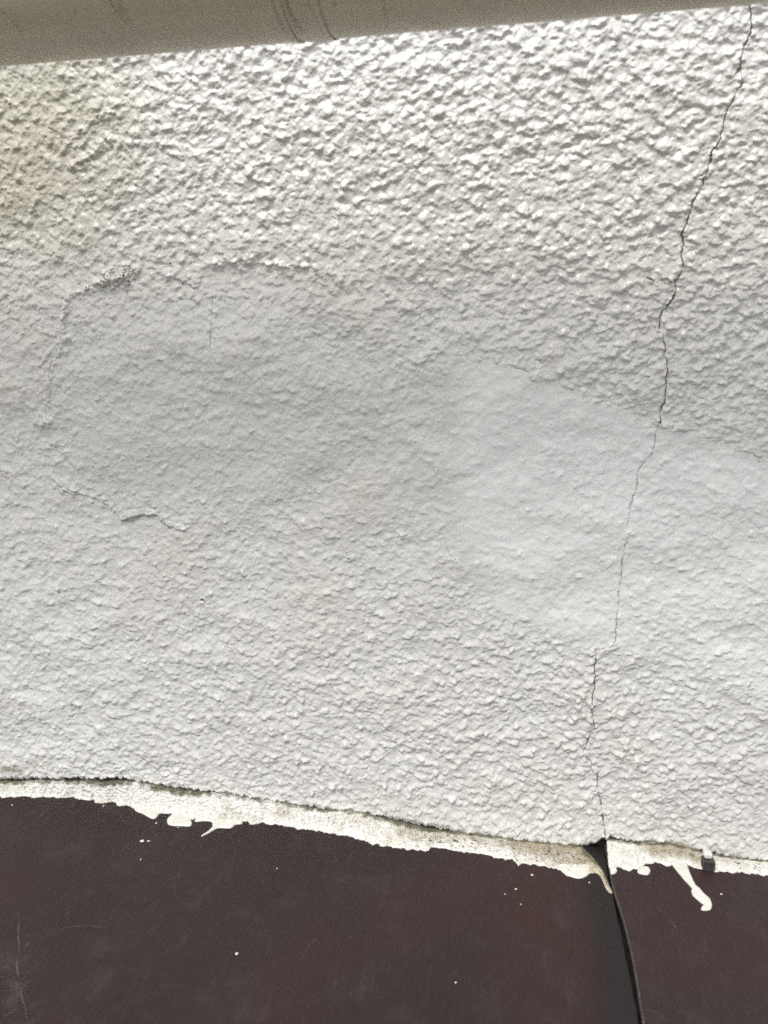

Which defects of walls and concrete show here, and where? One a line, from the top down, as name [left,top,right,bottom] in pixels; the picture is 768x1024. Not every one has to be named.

crack [583,5,752,840]